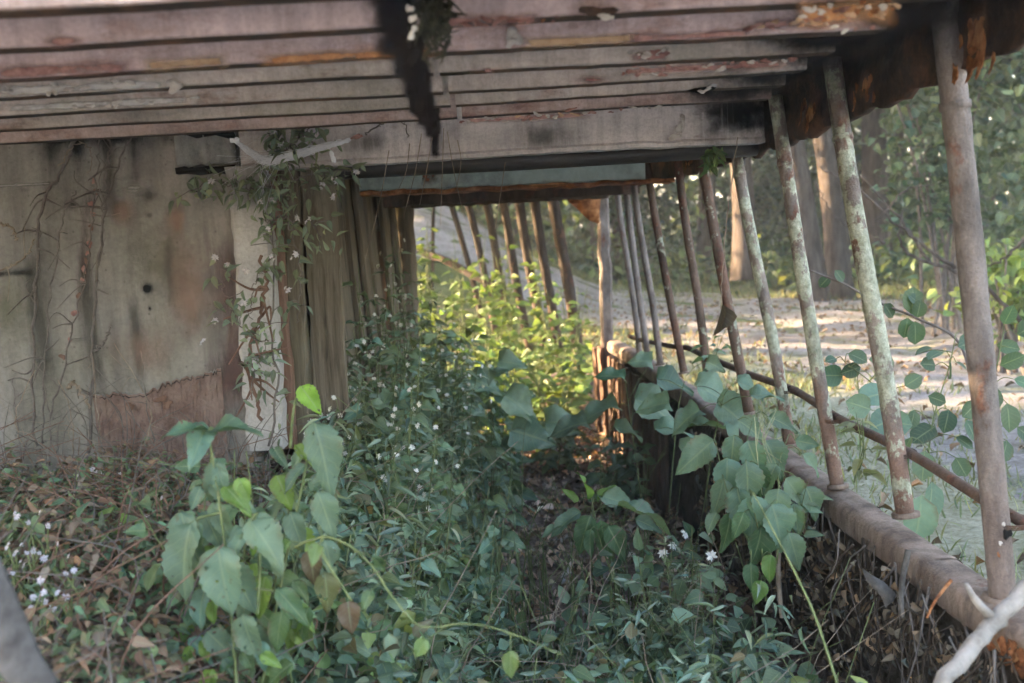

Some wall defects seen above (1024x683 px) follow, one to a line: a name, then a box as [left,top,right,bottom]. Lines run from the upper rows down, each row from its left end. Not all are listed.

peeling [742,0,901,34]
rust [952,14,996,85]
leakage [0,265,47,367]
spalling [93,368,229,490]